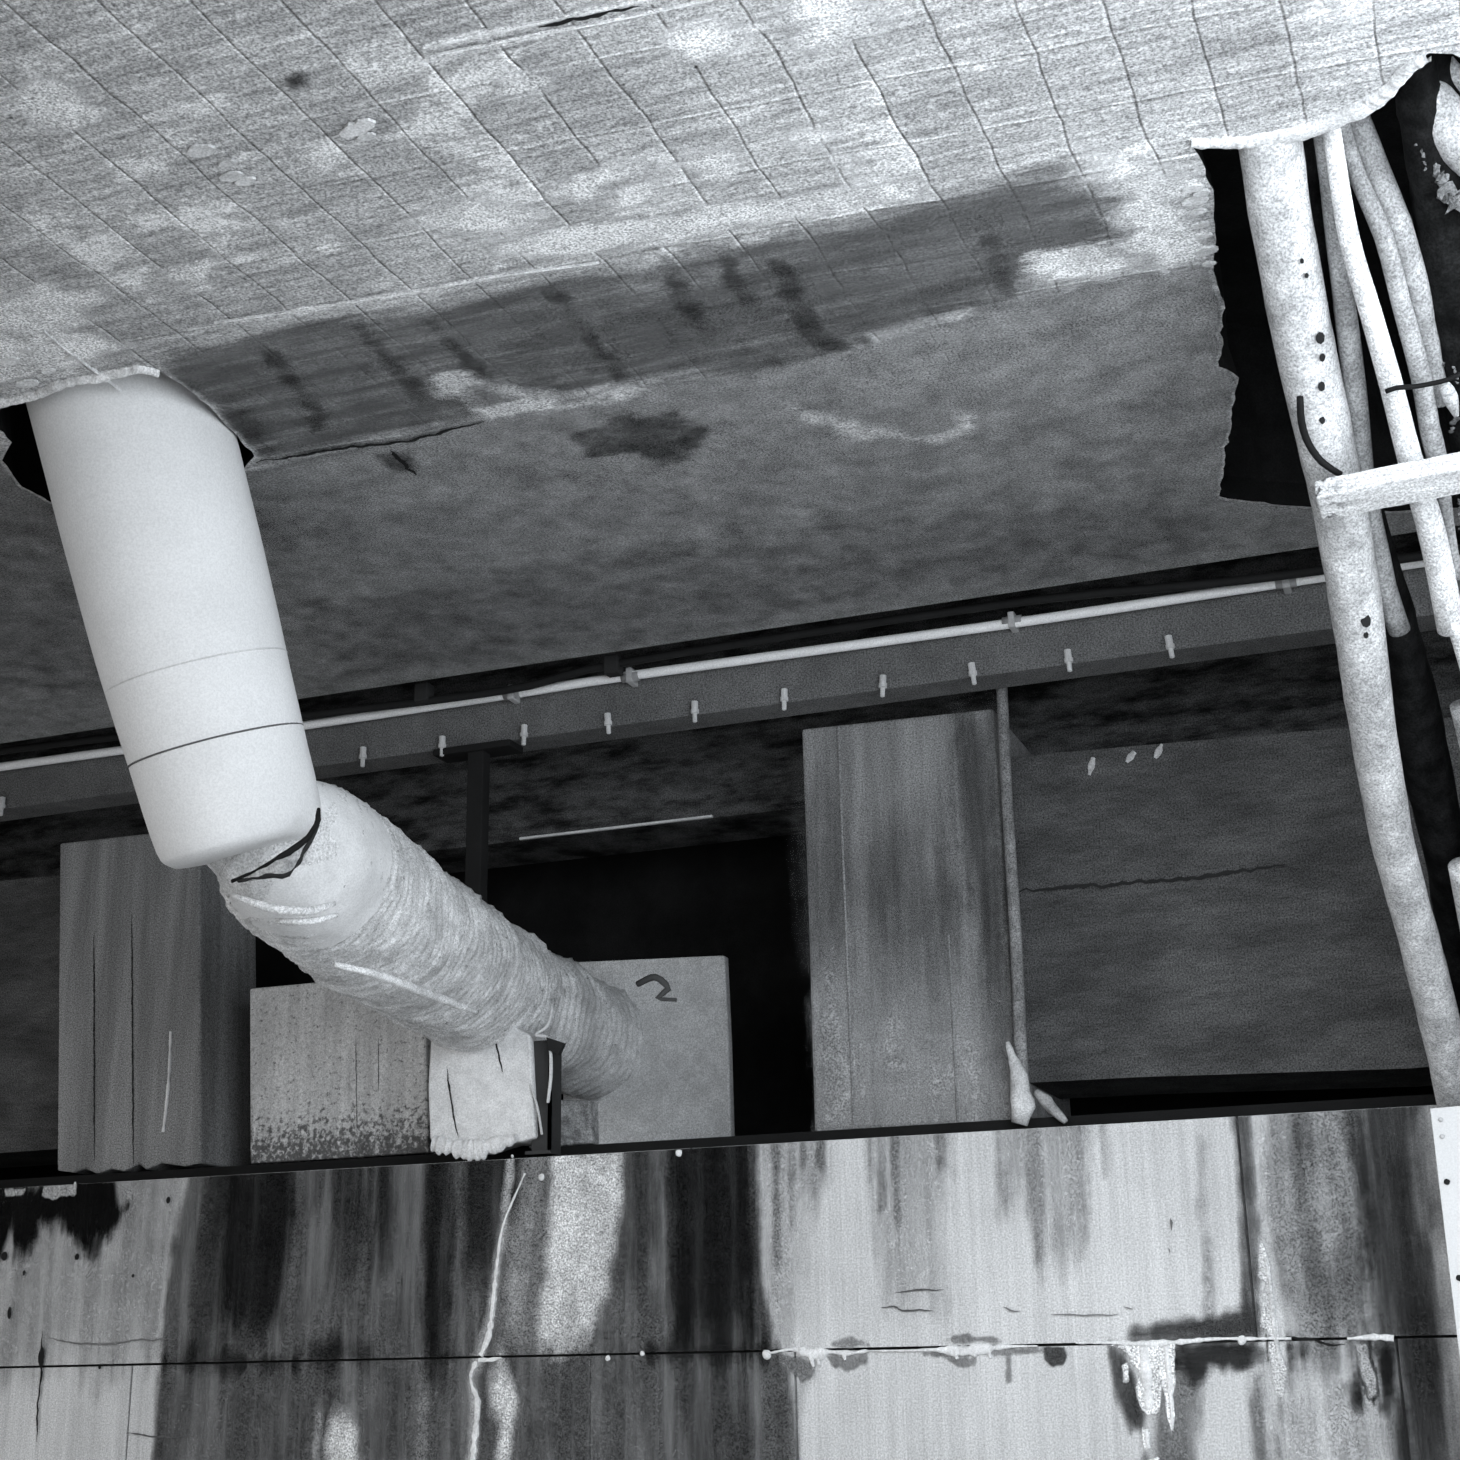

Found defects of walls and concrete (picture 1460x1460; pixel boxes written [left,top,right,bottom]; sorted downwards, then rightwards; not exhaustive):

leakage [677,151,740,184]
leakage [788,131,828,146]
peeling [1181,183,1219,267]
leakage [165,160,1209,462]
spalling [1316,332,1325,362]
crack [1019,864,1285,892]
leakage [0,1182,129,1259]
leakage [152,1106,1459,1460]